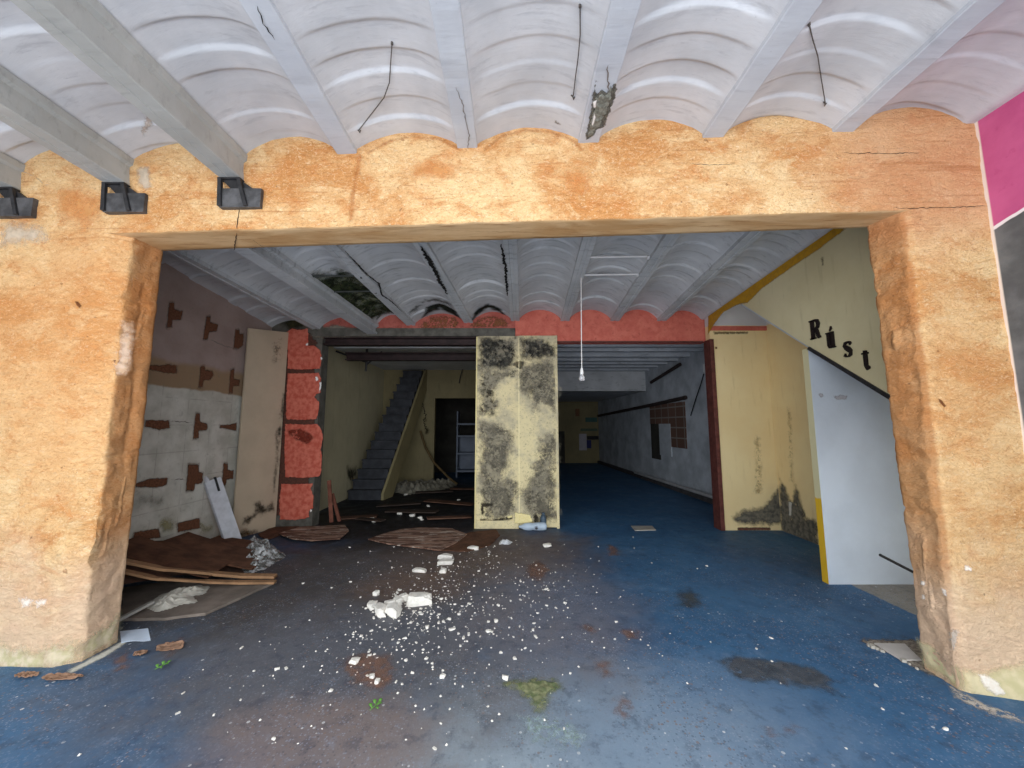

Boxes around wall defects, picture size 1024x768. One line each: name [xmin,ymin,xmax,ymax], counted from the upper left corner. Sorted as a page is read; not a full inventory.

spalling [586,66,617,140]
crack [845,149,919,157]
crack [895,203,983,211]
crack [345,251,400,310]
crack [420,246,448,294]
crack [500,244,509,296]
peeling [276,328,323,520]
water stain [479,338,557,522]
water stain [734,484,818,545]